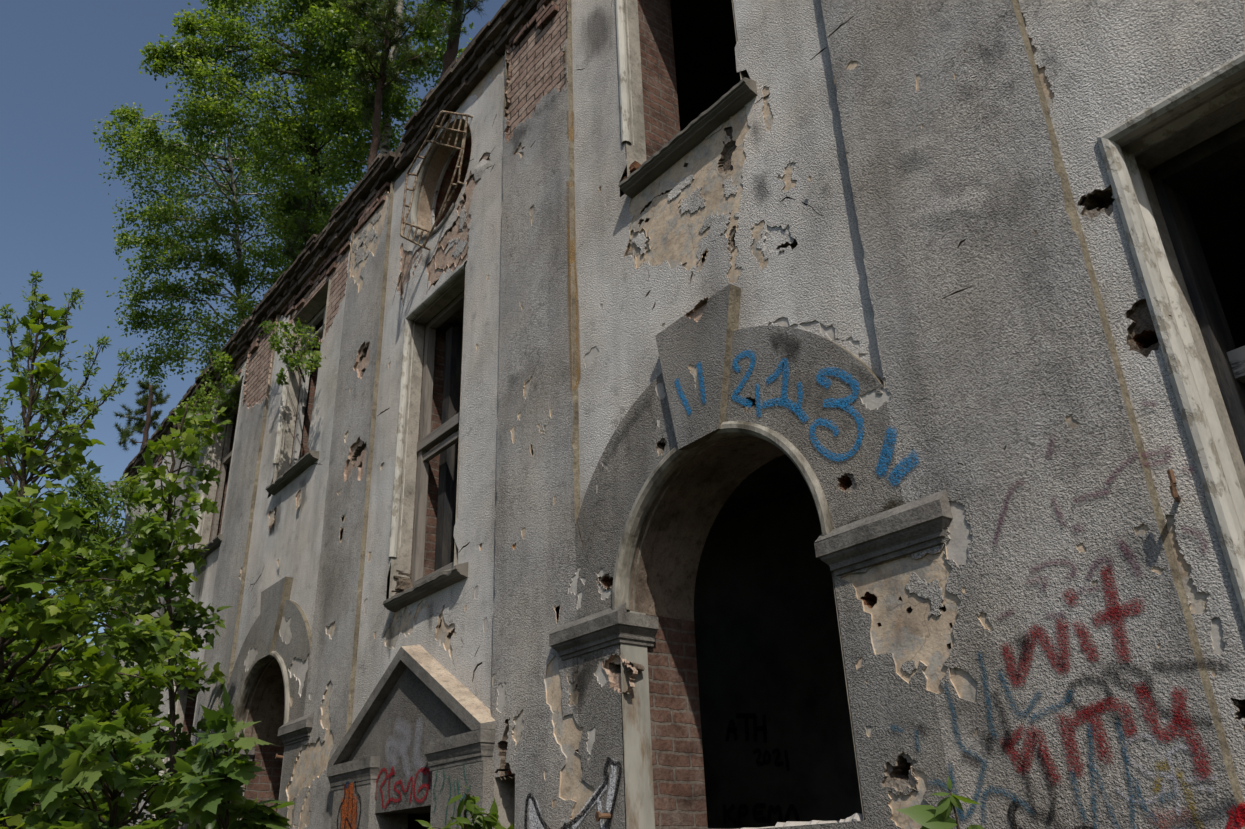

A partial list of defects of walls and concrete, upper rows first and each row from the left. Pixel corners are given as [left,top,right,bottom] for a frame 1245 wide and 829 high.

flaking render [243,190,390,409]
peeling [397,152,490,300]
peeling [621,85,798,284]
hole [1081,189,1115,211]
flaking render [1125,298,1160,357]
flaking render [337,431,367,495]
peeling [244,647,258,672]
peeling [279,615,335,829]
peeling [554,566,613,624]
peeling [544,653,645,819]
peeling [840,501,978,703]
spalling [1237,699,1245,720]